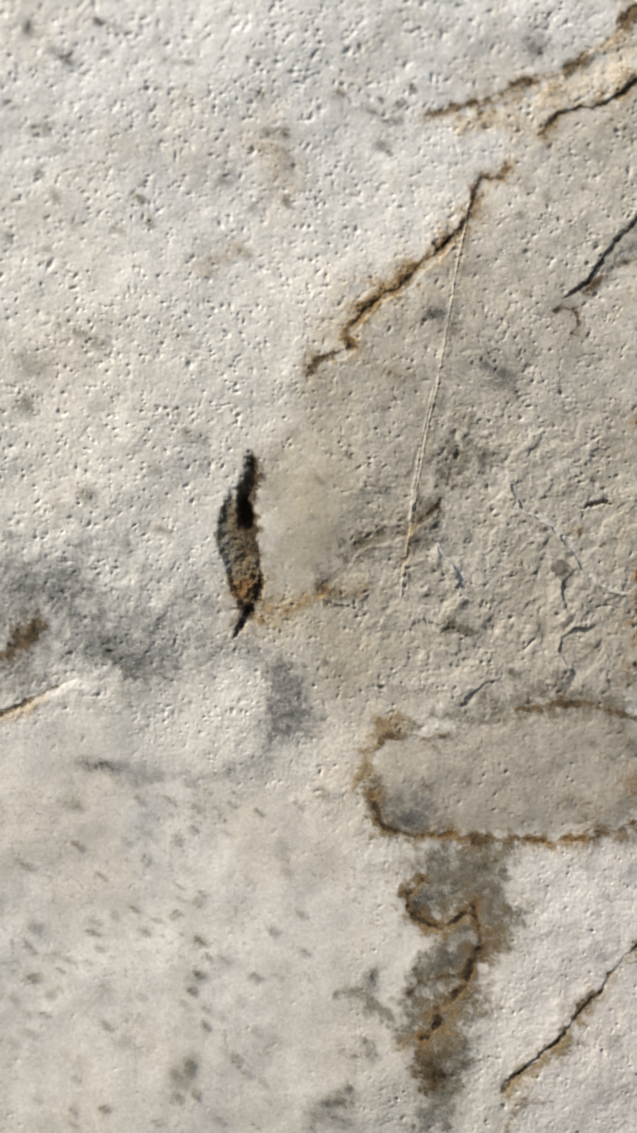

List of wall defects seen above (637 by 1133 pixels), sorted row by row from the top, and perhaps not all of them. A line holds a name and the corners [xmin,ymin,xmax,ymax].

crack [429,3,637,116]
crack [539,73,637,139]
crack [307,166,511,374]
crack [553,222,637,335]
spalling [214,452,266,639]
crack [314,429,497,597]
crack [0,685,58,716]
water stain [0,561,321,742]
corrosion [362,777,636,1131]
crack [501,972,611,1116]